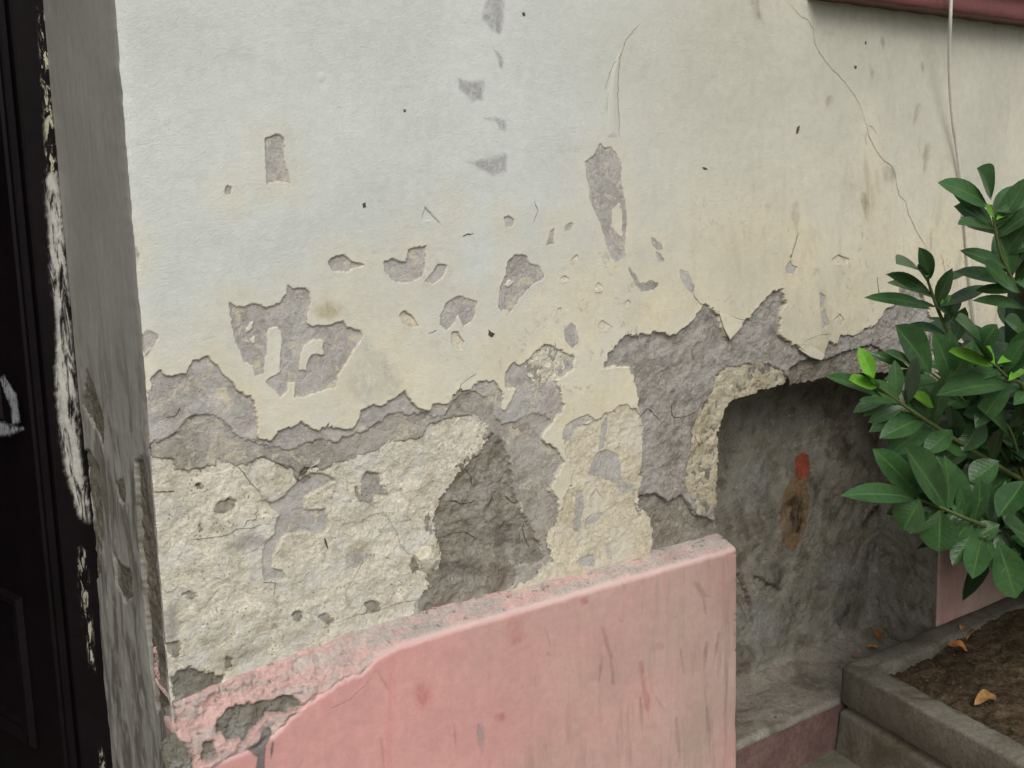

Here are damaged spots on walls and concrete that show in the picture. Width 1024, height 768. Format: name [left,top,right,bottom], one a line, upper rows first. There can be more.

peeling [265,135,289,183]
spalling [585,144,658,292]
spalling [383,246,446,283]
spalling [498,255,544,312]
spalling [139,286,941,768]